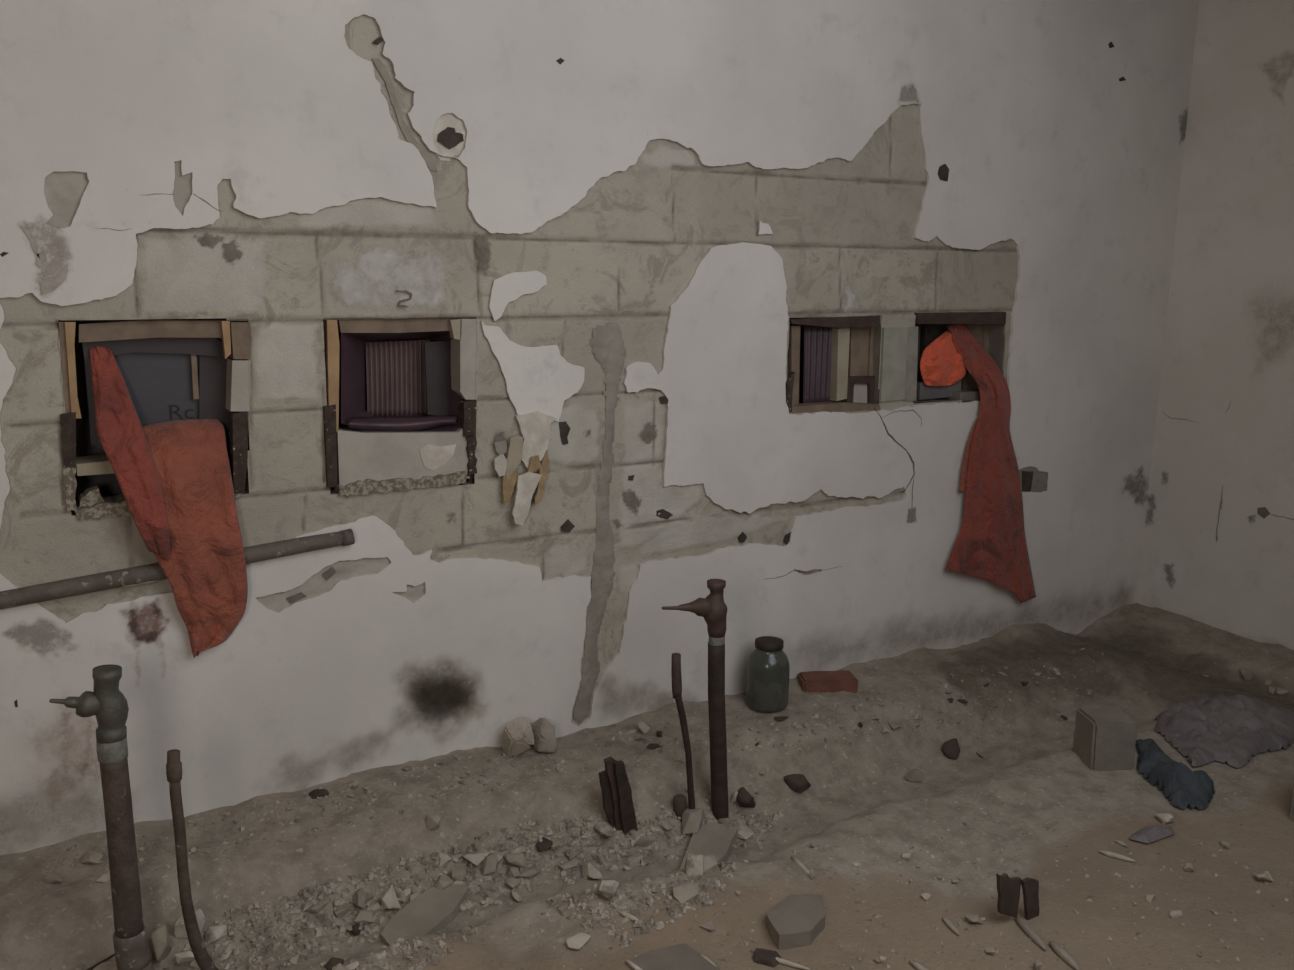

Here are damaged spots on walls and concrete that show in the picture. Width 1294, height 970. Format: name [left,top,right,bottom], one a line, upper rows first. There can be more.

flaking render [0,15,1019,726]
crack [767,566,842,579]
rust [129,603,164,643]